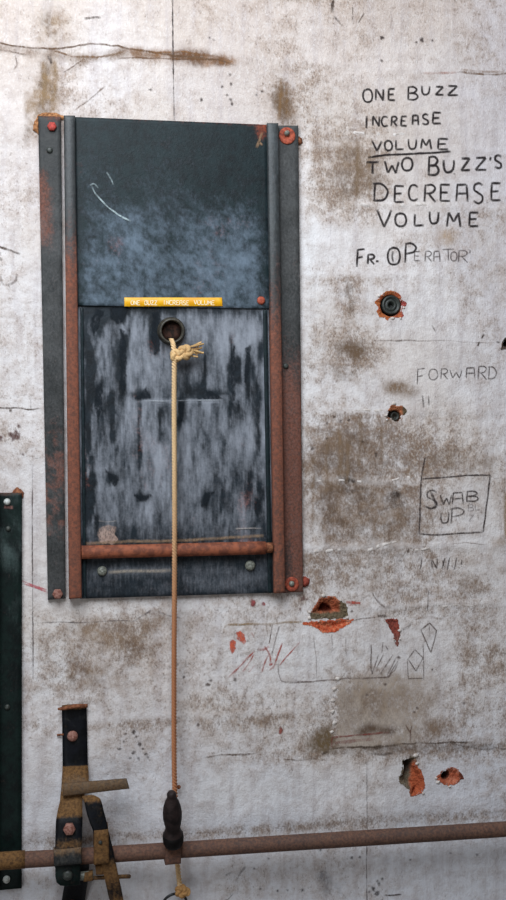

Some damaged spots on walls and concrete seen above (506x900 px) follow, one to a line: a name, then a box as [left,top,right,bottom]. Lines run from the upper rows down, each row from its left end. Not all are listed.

crack [1,8,220,89]
rust [155,50,233,65]
spalling [375,290,407,320]
spalling [384,402,407,422]
spalling [300,594,360,633]
peeling [230,631,246,653]
peeling [385,618,401,646]
peeling [329,675,422,747]
spalling [399,753,425,797]
spalling [435,767,464,788]